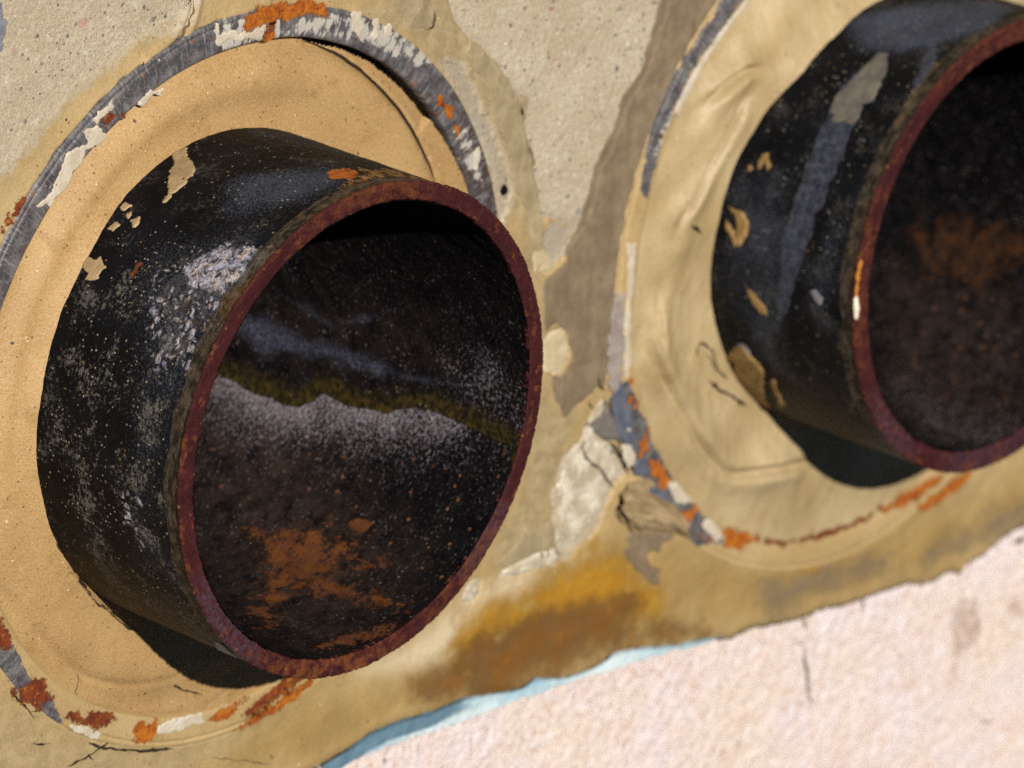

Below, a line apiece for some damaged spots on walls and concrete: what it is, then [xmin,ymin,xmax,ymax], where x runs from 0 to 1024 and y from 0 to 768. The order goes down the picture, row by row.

rust [243,0,329,42]
peeling [674,0,750,116]
peeling [36,100,115,208]
peeling [162,147,196,203]
peeling [107,202,141,231]
peeling [82,256,106,280]
spalling [499,242,724,585]
crack [582,372,642,533]
rust [701,471,972,551]
rust [235,516,410,651]
rust [11,677,55,712]
rust [66,710,117,732]